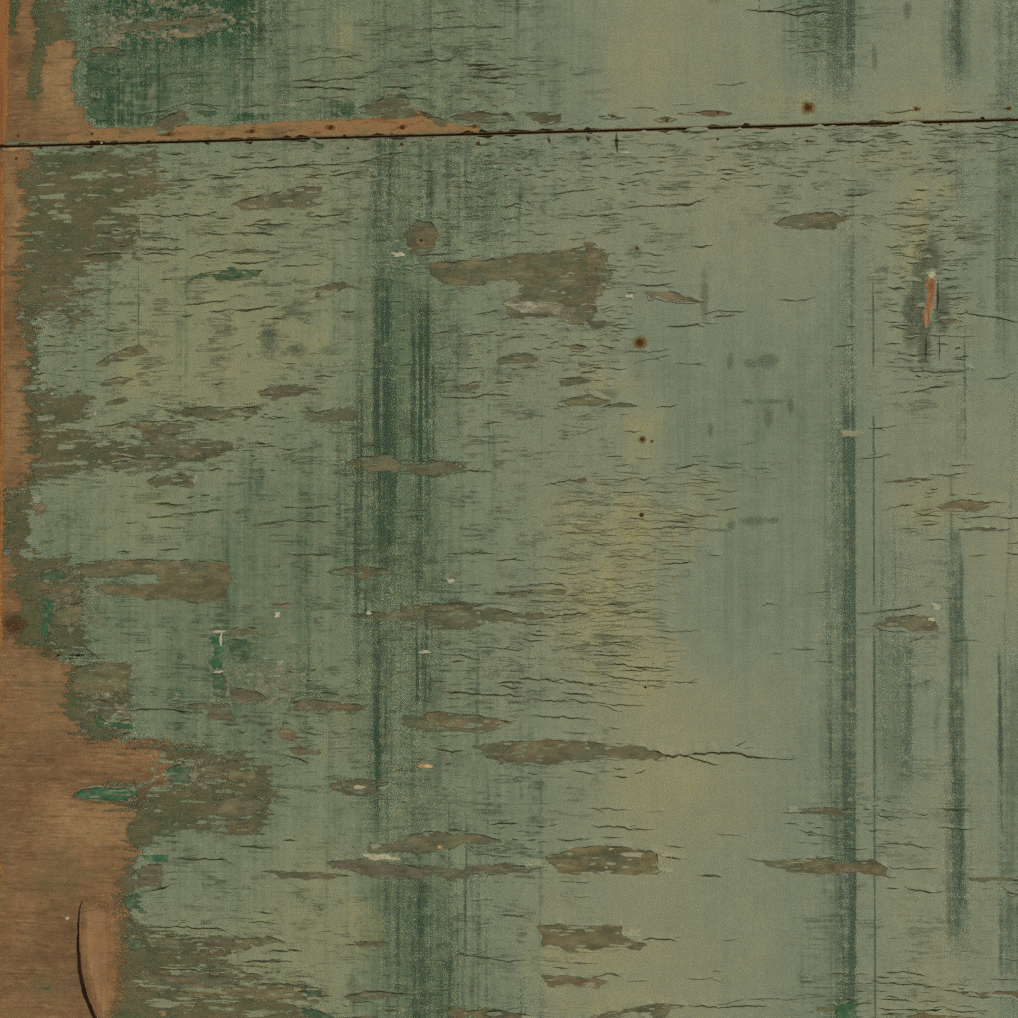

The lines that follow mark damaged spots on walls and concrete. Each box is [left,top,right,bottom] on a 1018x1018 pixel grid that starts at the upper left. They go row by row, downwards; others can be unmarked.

peeling [774,205,850,230]
peeling [385,217,616,329]
peeling [496,350,539,366]
peeling [558,340,640,408]
peeling [0,0,405,1018]
water stain [844,417,856,996]
peeling [402,708,666,767]
peeling [260,828,675,881]
crack [77,900,97,1018]
peeling [537,915,647,953]
peeling [571,995,688,1018]